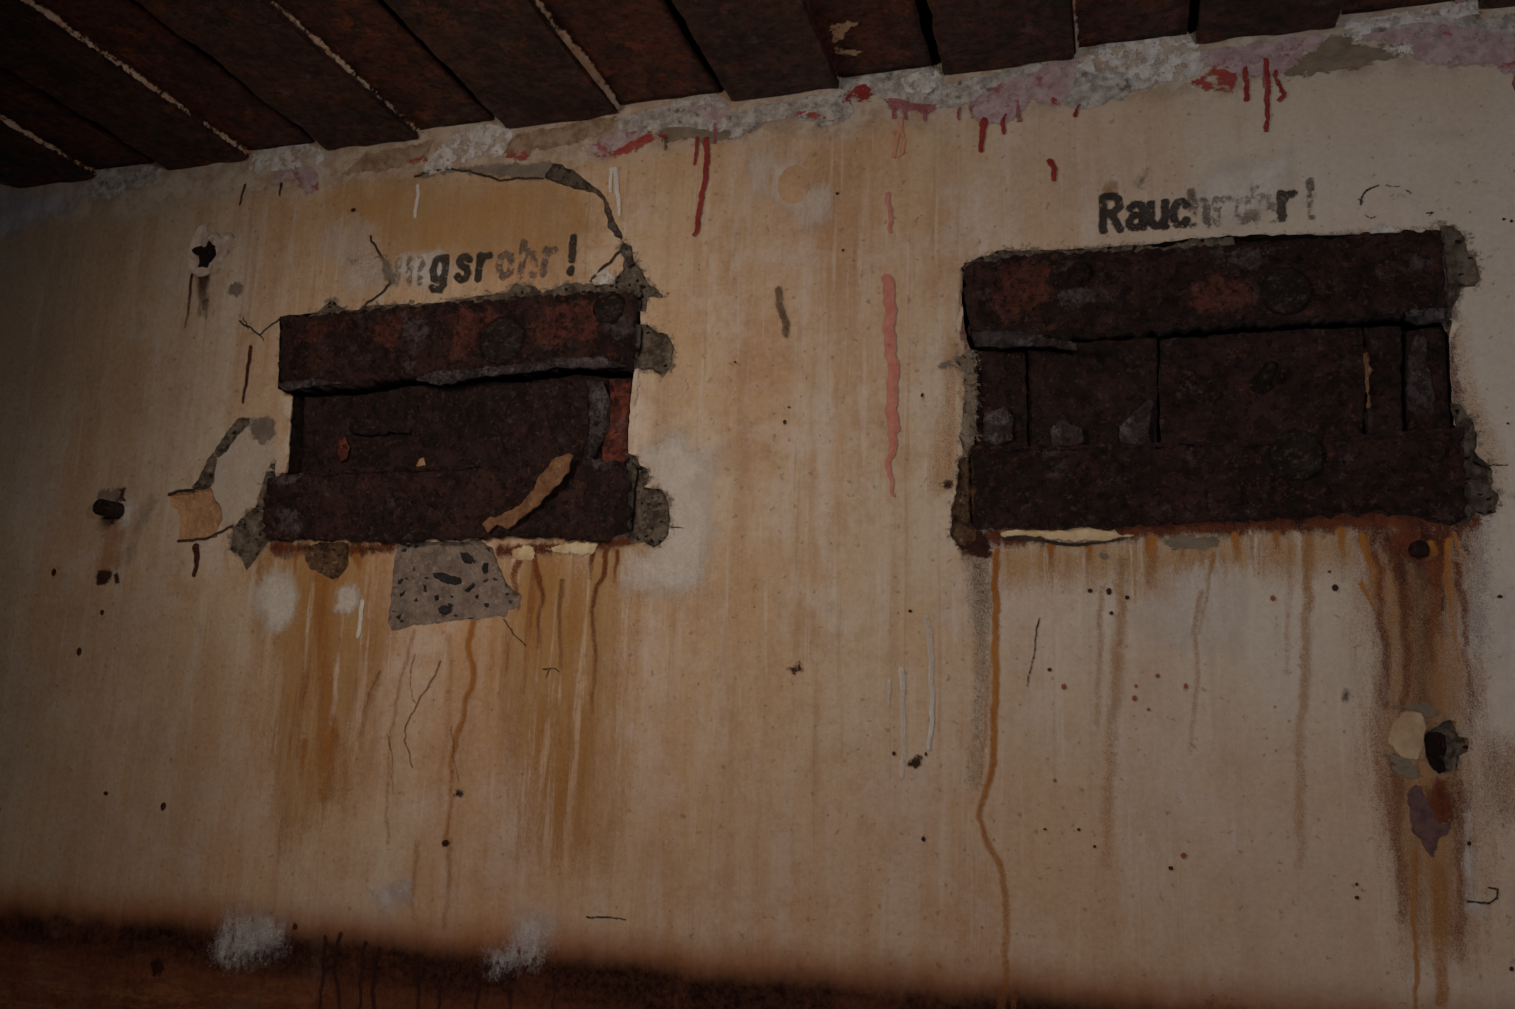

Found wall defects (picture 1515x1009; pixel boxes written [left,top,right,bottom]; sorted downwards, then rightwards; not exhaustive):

peeling [614,59,1043,140]
spalling [306,237,680,405]
crack [414,163,623,282]
corrosion [415,356,626,387]
spalling [1364,220,1488,346]
spalling [388,380,611,631]
spalling [623,449,675,549]
corrosion [232,538,416,868]
corrosion [436,534,650,929]
corrosion [953,302,1510,1009]
leakage [1461,722,1515,918]
leakage [0,839,1515,1009]